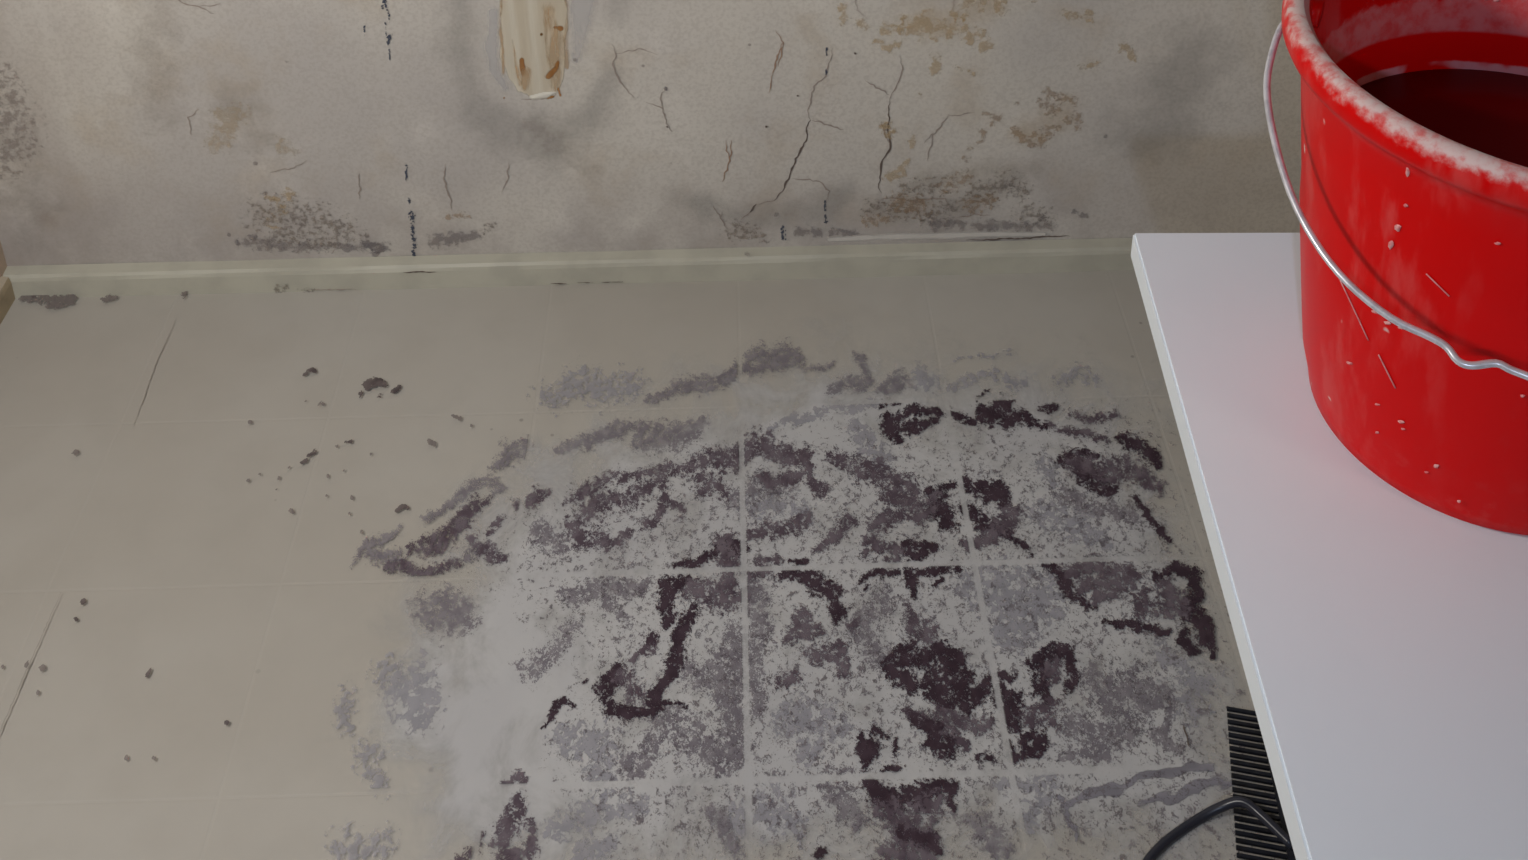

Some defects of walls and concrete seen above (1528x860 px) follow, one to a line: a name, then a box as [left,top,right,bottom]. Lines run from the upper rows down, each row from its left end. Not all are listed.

flaking render [500,0,568,100]
rust [546,61,561,99]
crack [612,45,670,129]
crack [769,32,784,92]
crack [713,50,844,226]
crack [866,58,986,217]